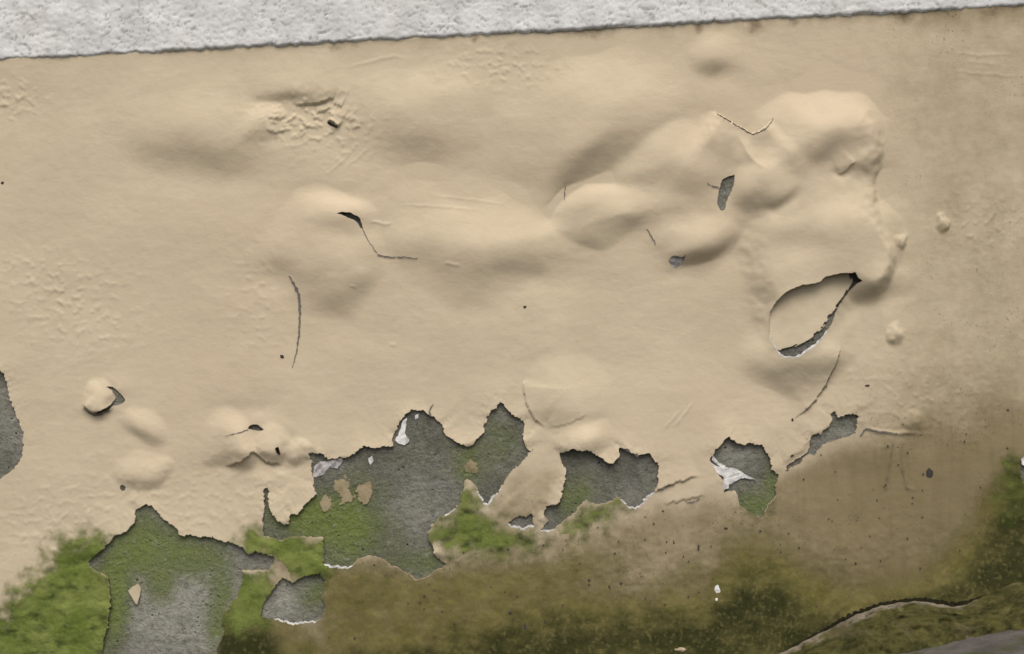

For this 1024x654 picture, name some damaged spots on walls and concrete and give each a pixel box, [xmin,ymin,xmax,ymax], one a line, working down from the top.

peeling [717,175,734,210]
crack [363,230,418,259]
crack [288,276,301,367]
peeling [778,272,862,357]
peeling [0,371,24,479]
peeling [97,387,125,413]
peeling [261,402,533,623]
peeling [509,448,659,530]
peeling [710,412,858,518]
peeling [89,504,275,654]
crack [791,595,982,647]